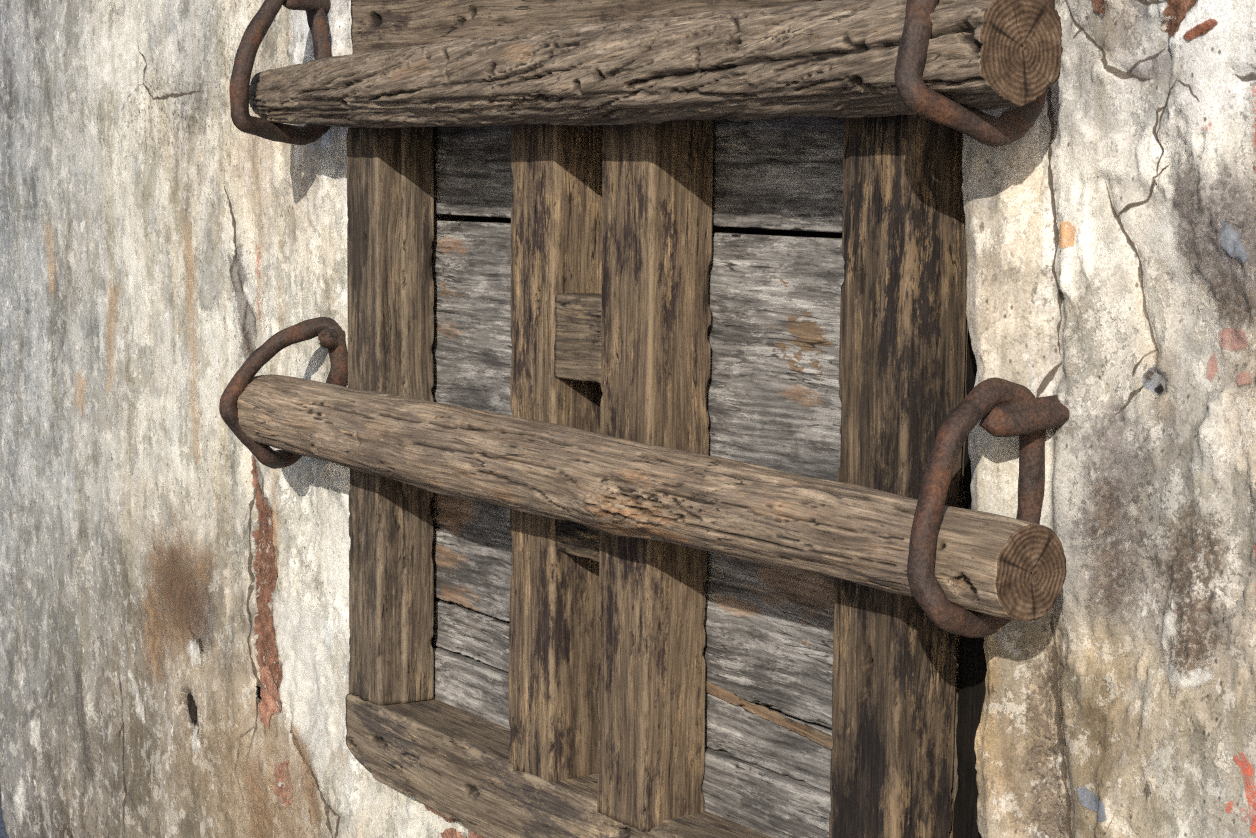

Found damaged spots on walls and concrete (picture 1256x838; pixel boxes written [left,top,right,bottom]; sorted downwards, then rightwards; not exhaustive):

spalling [1092,0,1106,16]
spalling [1160,0,1218,41]
crack [121,45,201,110]
crack [1065,0,1199,419]
peeling [251,454,345,780]
spalling [273,760,293,808]
peeling [397,802,484,838]